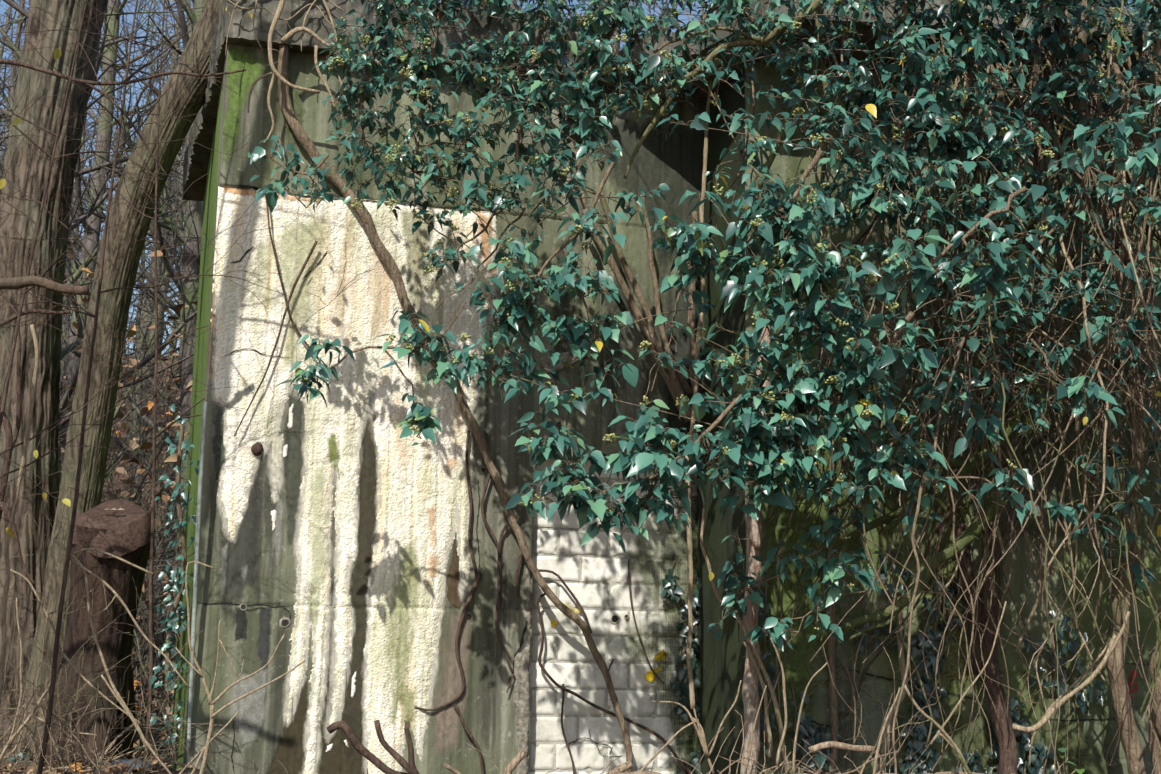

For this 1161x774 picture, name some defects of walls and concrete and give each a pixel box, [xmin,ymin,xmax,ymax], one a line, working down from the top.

damp [211,125,499,774]